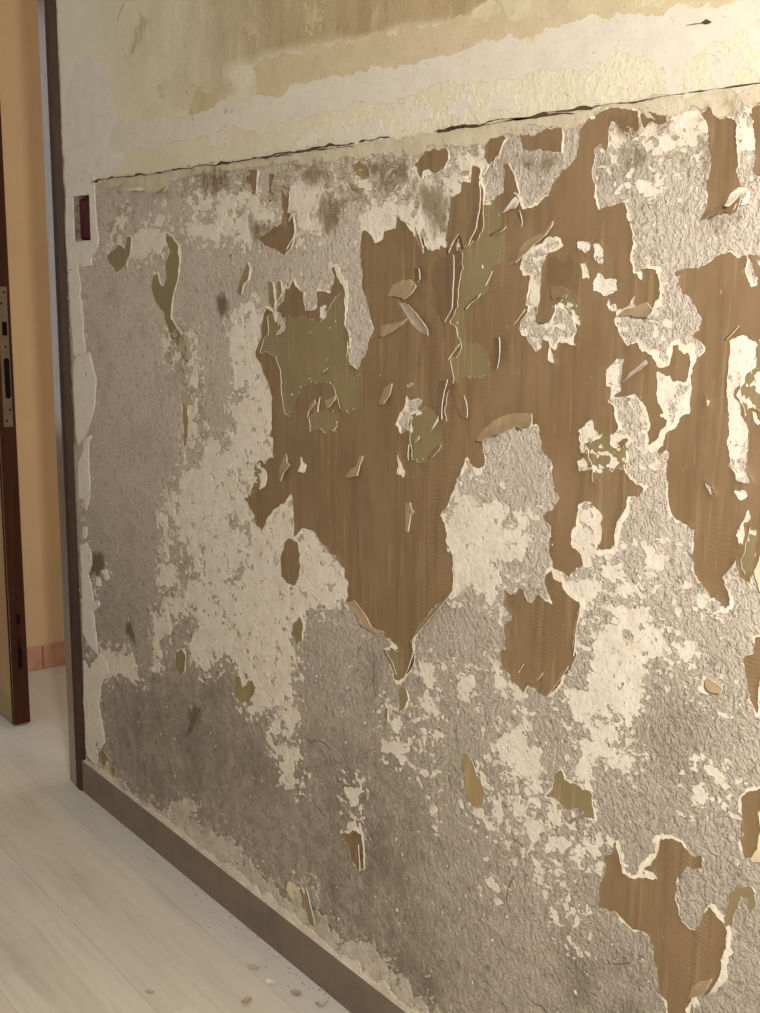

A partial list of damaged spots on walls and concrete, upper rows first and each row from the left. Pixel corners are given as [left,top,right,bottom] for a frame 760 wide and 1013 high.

crack [436,82,760,133]
crack [91,136,390,183]
peeling [614,166,685,204]
peeling [631,537,673,594]
peeling [455,663,487,703]
peeling [664,668,733,719]
peeling [734,634,760,718]
flaking render [77,516,452,1013]
peeling [460,753,511,833]
peeling [676,752,760,862]
peeling [476,857,512,908]
peeling [530,855,592,931]